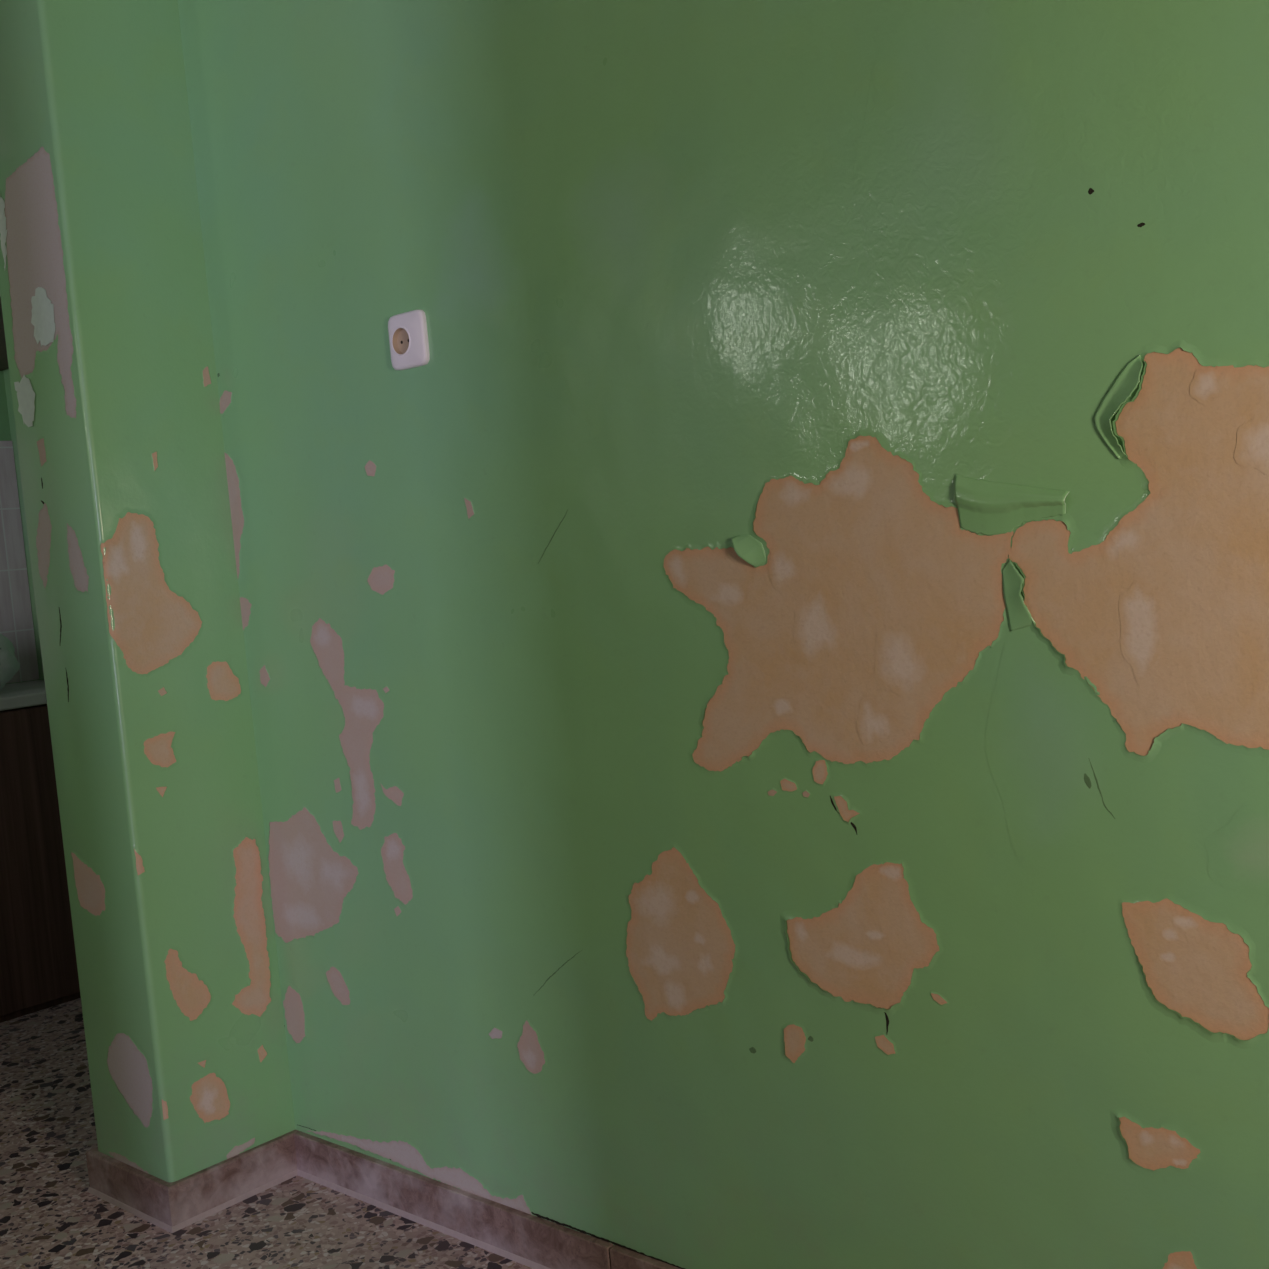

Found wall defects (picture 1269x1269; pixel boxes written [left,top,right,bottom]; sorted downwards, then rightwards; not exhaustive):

peeling [0,141,79,469]
peeling [65,507,205,678]
peeling [660,340,1269,826]
peeling [160,614,416,1046]
peeling [106,1030,170,1131]
peeling [185,1059,233,1128]
peeling [305,1128,534,1215]
peeling [622,841,740,1024]
peeling [780,1021,813,1067]
peeling [780,857,944,1017]
peeling [1110,1108,1208,1179]
peeling [1118,891,1269,1049]